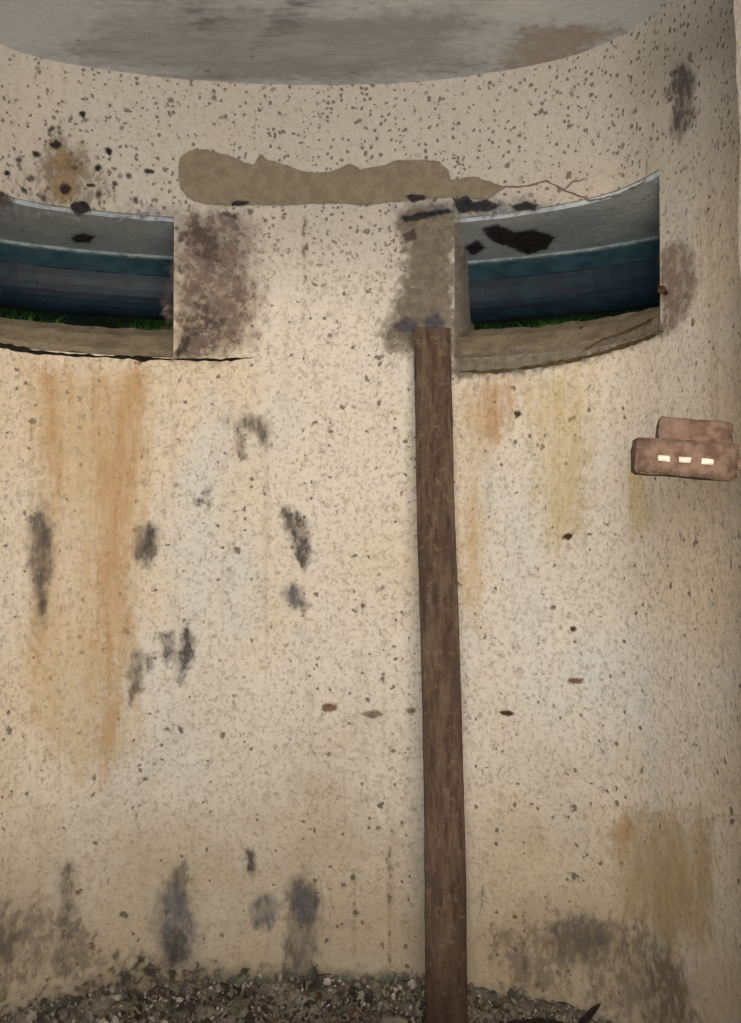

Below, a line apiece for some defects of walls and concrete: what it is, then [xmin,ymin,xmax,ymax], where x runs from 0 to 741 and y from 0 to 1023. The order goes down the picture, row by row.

damp [507,26,612,69]
damp [666,65,694,140]
spalling [164,149,556,361]
peeling [661,243,695,329]
damp [237,418,266,458]
damp [29,512,52,613]
damp [135,524,157,561]
damp [282,508,311,567]
damp [288,585,304,609]
damp [161,627,194,670]
damp [246,850,255,871]
damp [75,870,320,997]